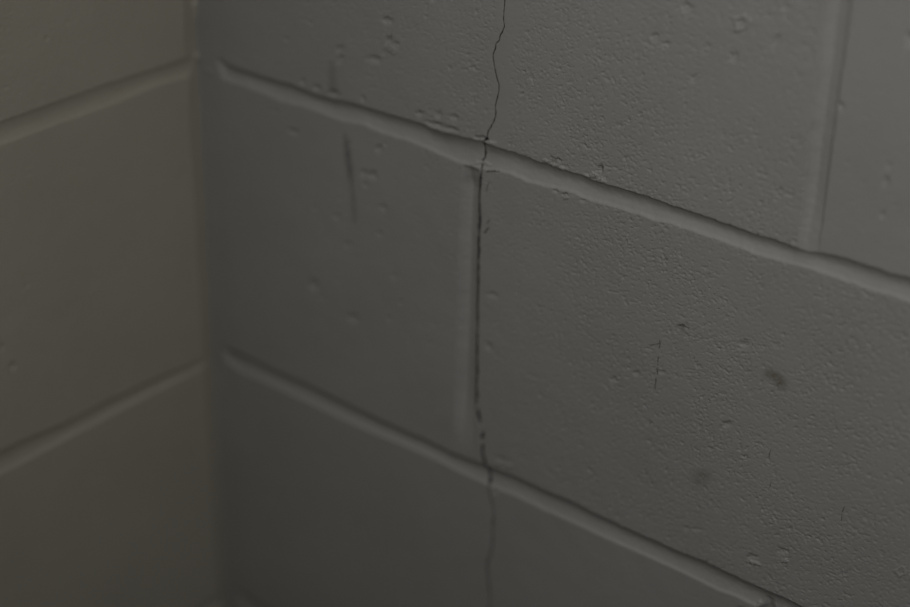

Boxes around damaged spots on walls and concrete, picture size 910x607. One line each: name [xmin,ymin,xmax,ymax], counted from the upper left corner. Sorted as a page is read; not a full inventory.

crack [476,0,505,607]